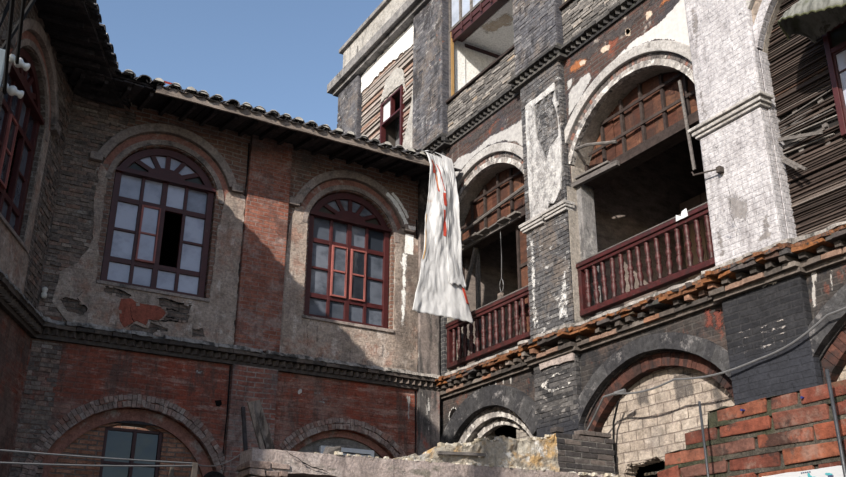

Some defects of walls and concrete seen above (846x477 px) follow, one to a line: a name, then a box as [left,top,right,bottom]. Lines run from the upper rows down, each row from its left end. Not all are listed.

damp [482,13,513,32]
peeling [618,0,698,57]
flaking render [453,60,591,219]
flaking render [25,73,136,317]
peeling [102,285,204,337]
peeling [558,271,568,318]